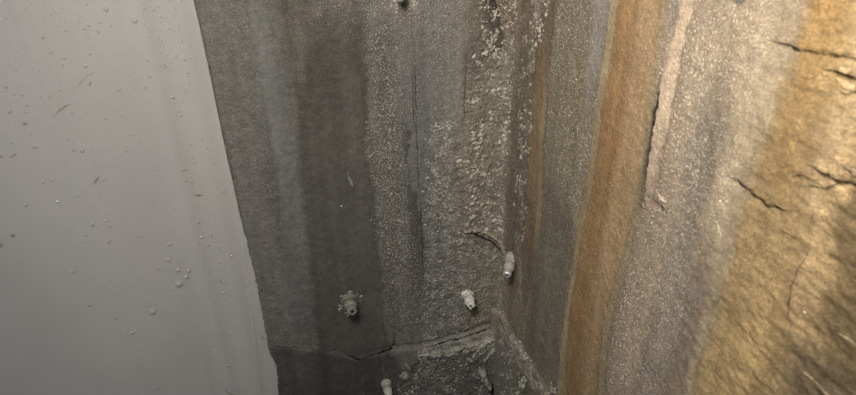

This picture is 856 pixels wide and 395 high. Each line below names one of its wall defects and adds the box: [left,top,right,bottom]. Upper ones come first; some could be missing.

crack [769,40,856,95]
leakage [247,0,572,395]
corrosion [557,0,666,395]
crack [730,177,814,315]
crack [792,163,856,189]
crack [277,327,490,361]